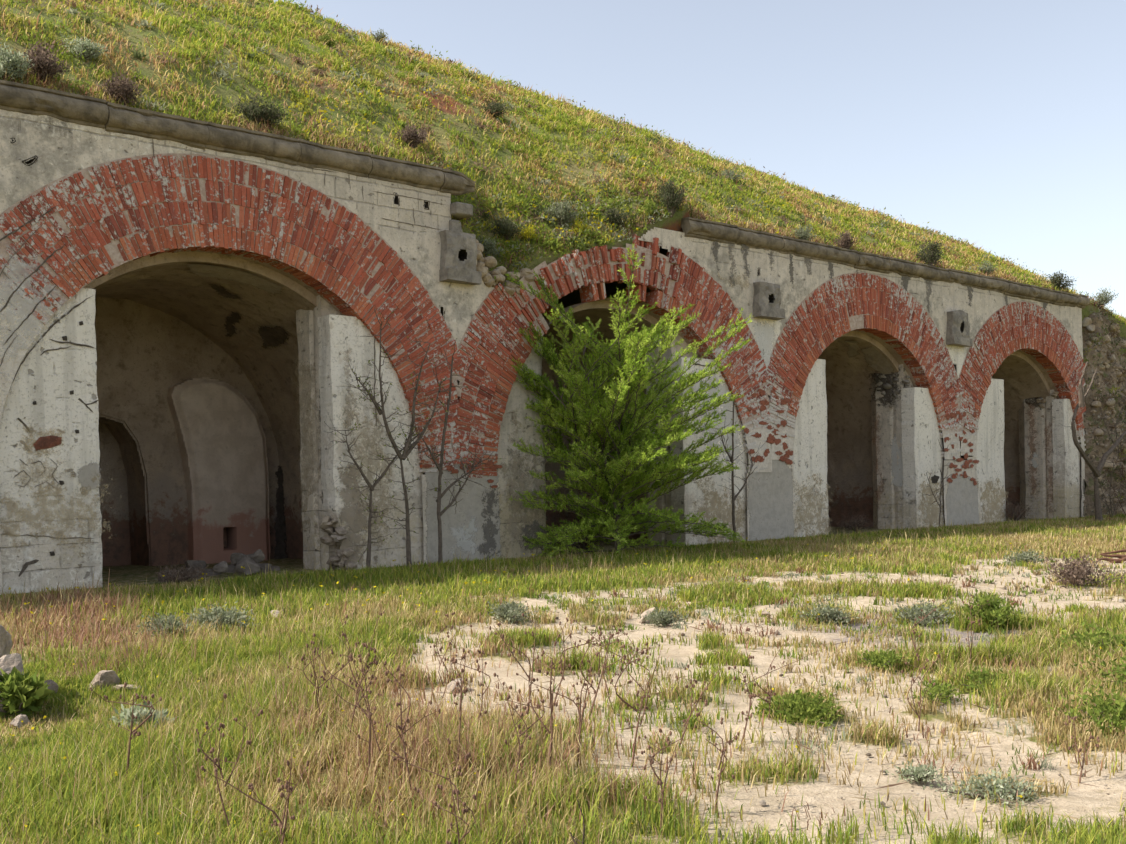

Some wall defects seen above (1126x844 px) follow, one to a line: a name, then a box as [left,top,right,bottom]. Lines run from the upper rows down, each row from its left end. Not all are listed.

spalling [33,435,62,451]